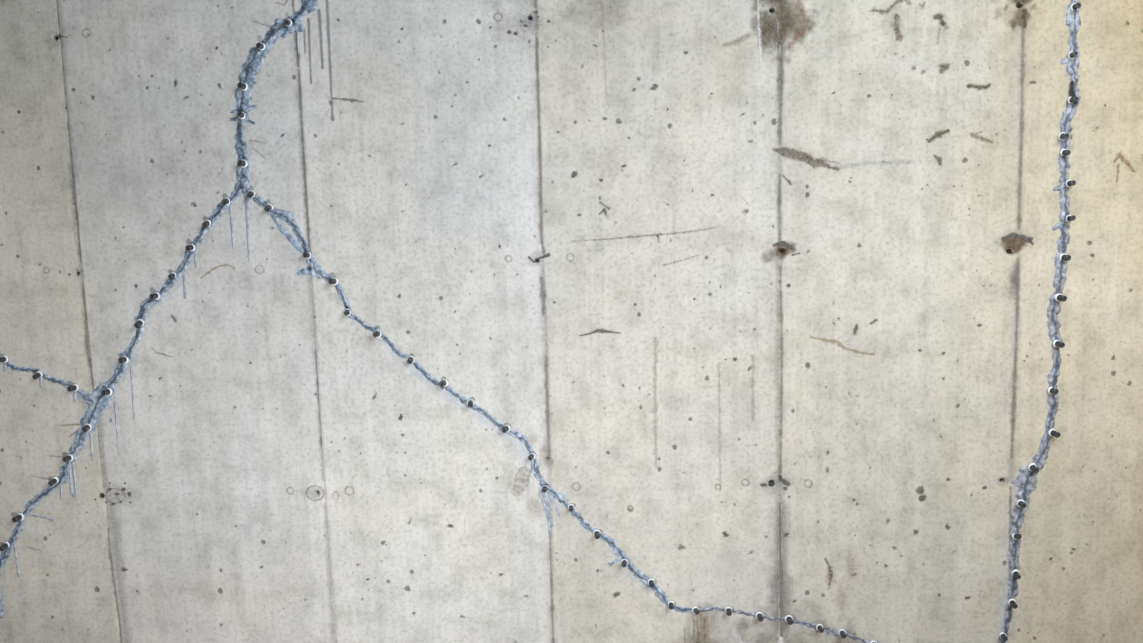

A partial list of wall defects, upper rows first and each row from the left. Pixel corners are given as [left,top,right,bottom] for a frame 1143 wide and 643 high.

crack [0,0,878,643]
water stain [757,0,811,66]
crack [999,0,1082,643]